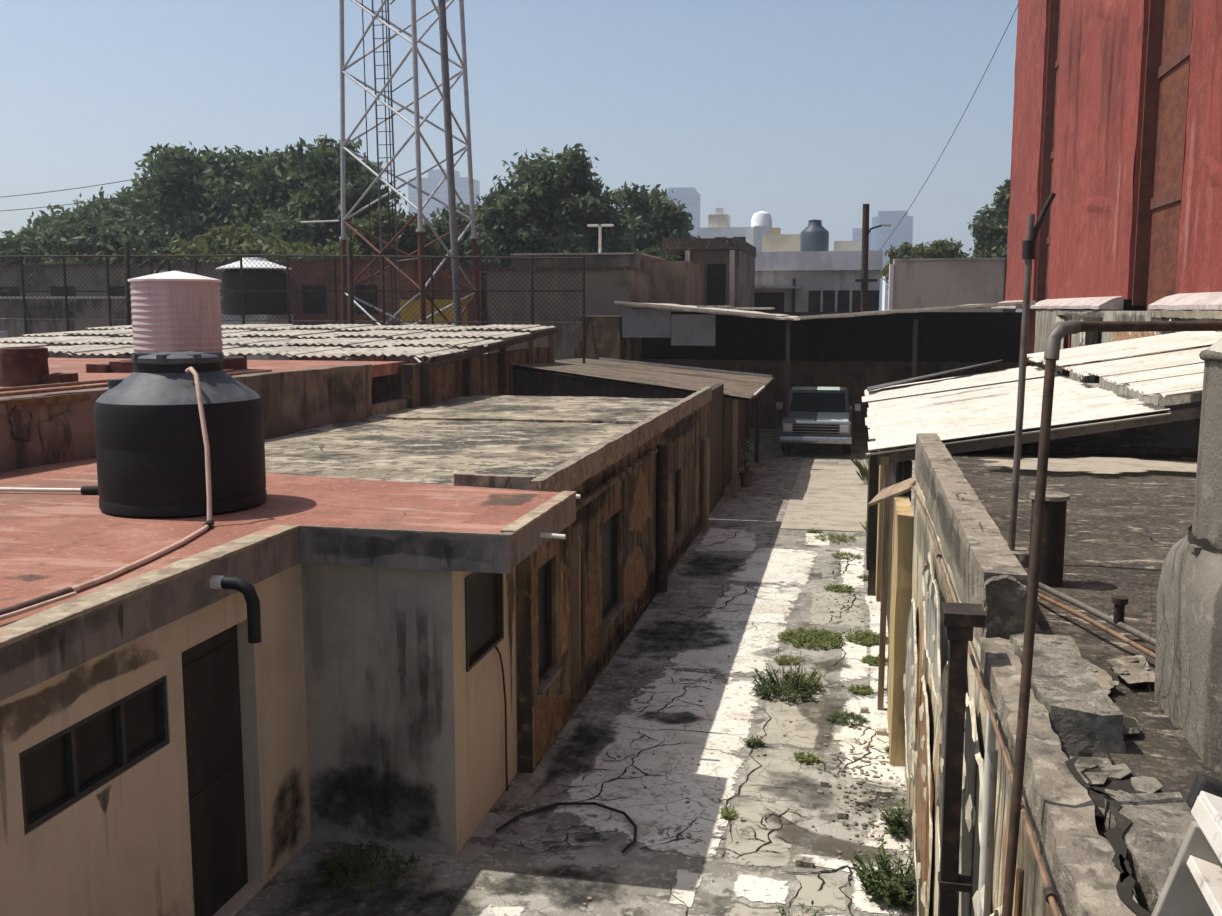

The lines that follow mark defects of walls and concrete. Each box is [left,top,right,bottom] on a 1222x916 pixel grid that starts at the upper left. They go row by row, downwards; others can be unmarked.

crack [665,582,777,630]
crack [818,555,866,685]
spalling [983,575,1027,640]
water stain [0,653,147,736]
rust [915,604,924,758]
spalling [1123,714,1142,735]
water stain [98,786,111,812]
water stain [272,767,430,865]
crack [511,669,912,916]
rust [923,774,933,907]
rust [999,805,1023,916]
crack [1062,730,1152,916]